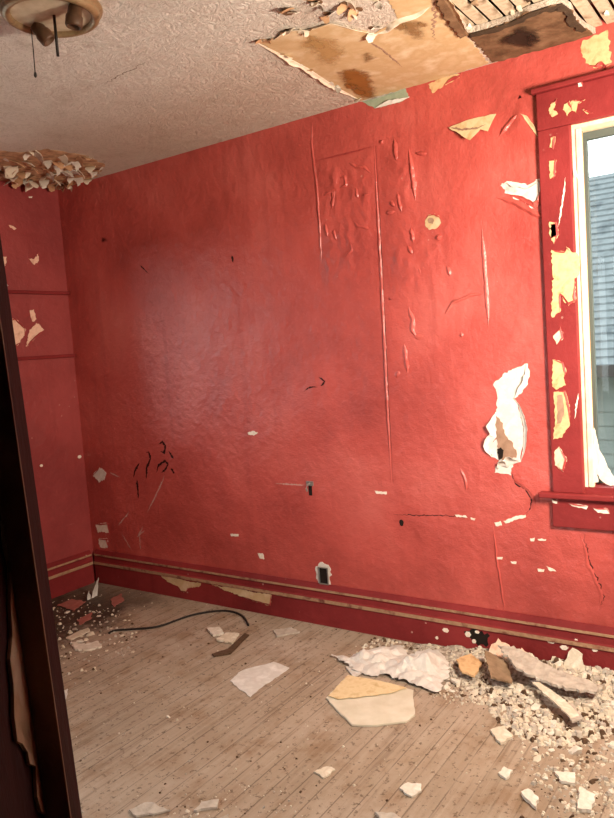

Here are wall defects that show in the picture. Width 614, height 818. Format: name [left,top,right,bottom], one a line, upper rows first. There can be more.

water stain [304,36,342,61]
peeling [255,0,614,103]
water stain [501,27,540,49]
water stain [338,69,374,98]
peeling [549,99,592,117]
peeling [0,149,105,198]
peeling [549,221,580,317]
peeling [12,309,44,347]
peeling [552,360,570,472]
peeling [161,576,201,593]
peeling [212,584,272,606]